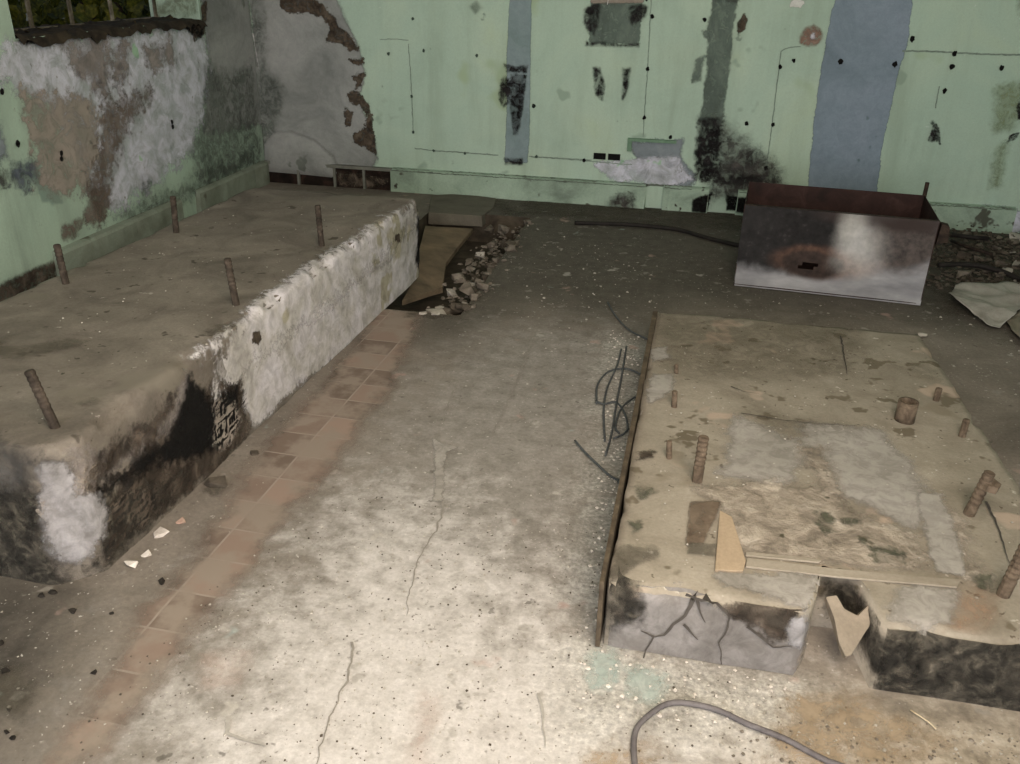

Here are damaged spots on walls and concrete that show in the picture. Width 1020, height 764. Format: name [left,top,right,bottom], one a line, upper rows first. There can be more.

peeling [0,1,212,227]
spalling [279,0,377,155]
damp [691,0,779,190]
damp [38,462,108,562]
crack [406,501,444,616]
crack [641,591,793,665]
crack [316,642,355,764]